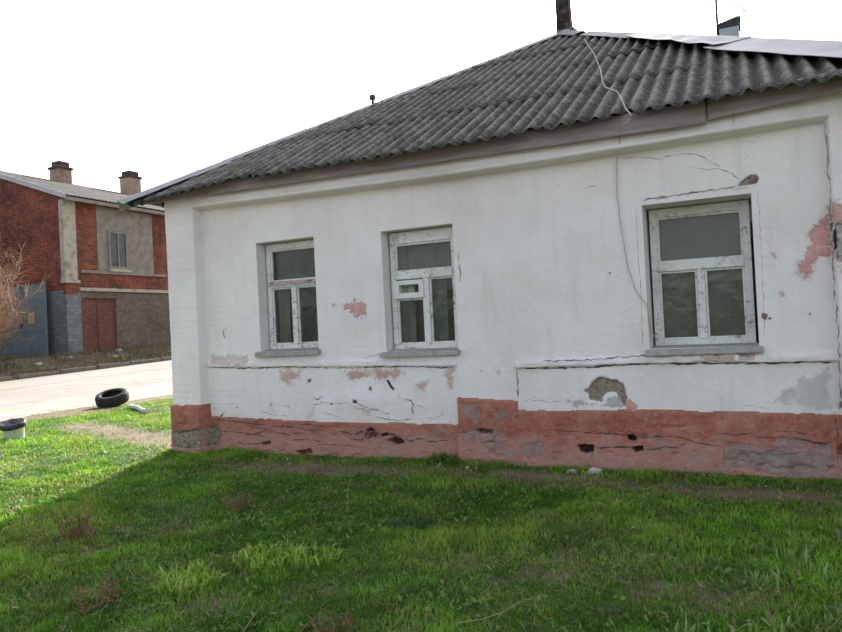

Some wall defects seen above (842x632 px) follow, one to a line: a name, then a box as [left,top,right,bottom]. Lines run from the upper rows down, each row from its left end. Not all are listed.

spalling [739,175,759,186]
peeling [798,203,842,278]
peeling [332,300,367,317]
crack [516,125,842,471]
spalling [584,377,627,405]
crack [175,393,447,448]
spalling [723,438,842,477]